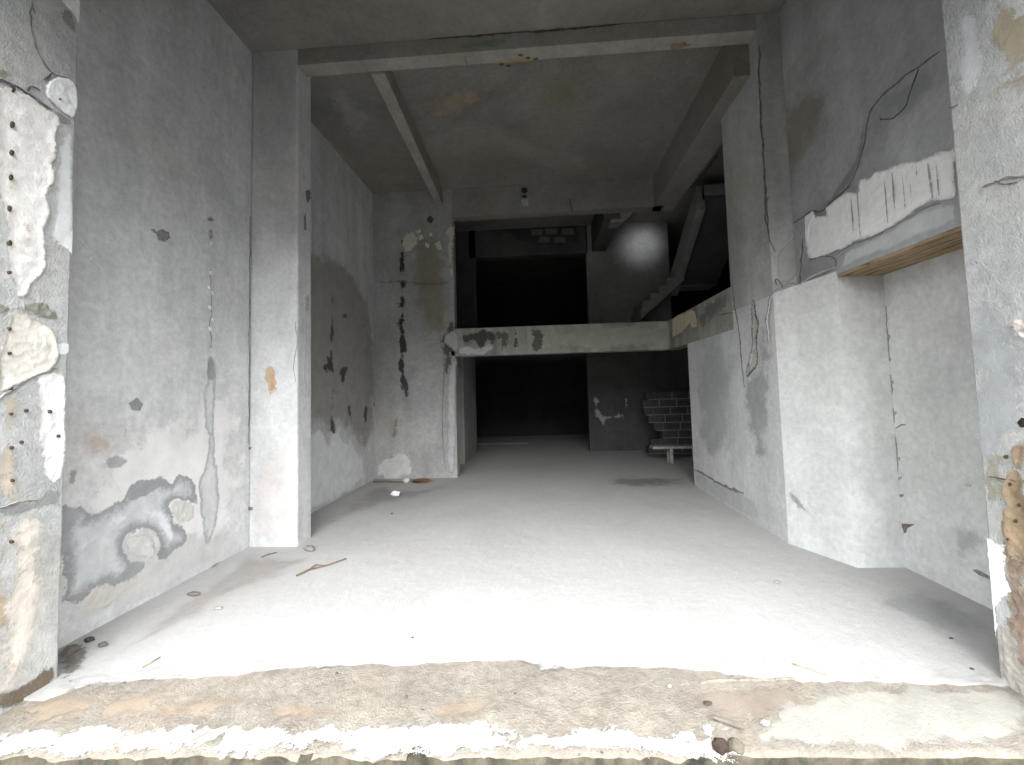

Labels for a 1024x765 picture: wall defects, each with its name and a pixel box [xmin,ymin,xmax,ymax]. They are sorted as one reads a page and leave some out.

crack [0,2,77,109]
spalling [0,76,77,298]
crack [758,45,941,350]
spalling [805,148,956,259]
rust [0,387,29,500]
spalling [0,311,67,484]
damp [0,357,237,632]
rust [264,365,278,395]
damp [311,247,375,453]
crack [695,470,743,494]
crack [885,306,905,481]
spalling [999,440,1024,671]